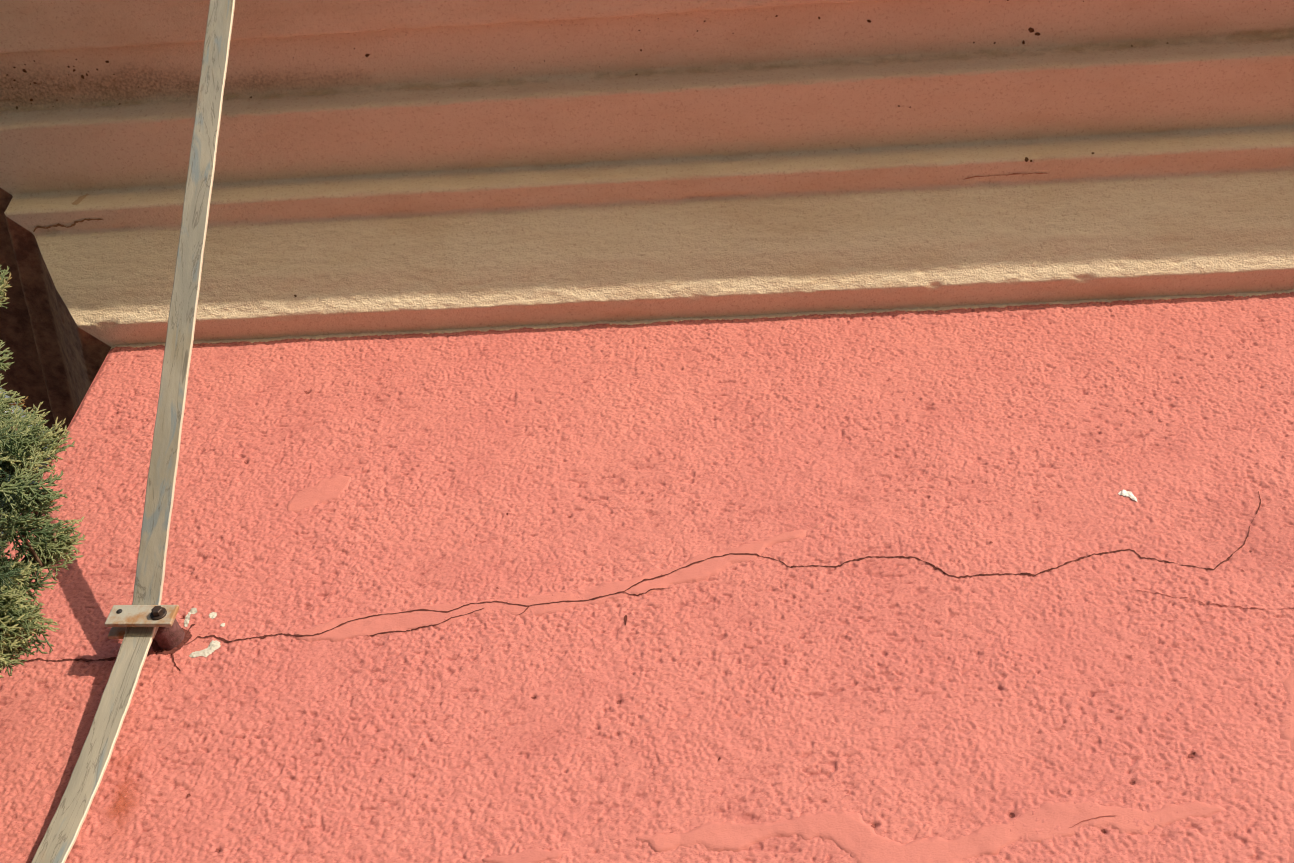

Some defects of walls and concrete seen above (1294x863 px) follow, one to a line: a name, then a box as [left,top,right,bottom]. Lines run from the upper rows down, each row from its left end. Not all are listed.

crack [172,491,1294,671]